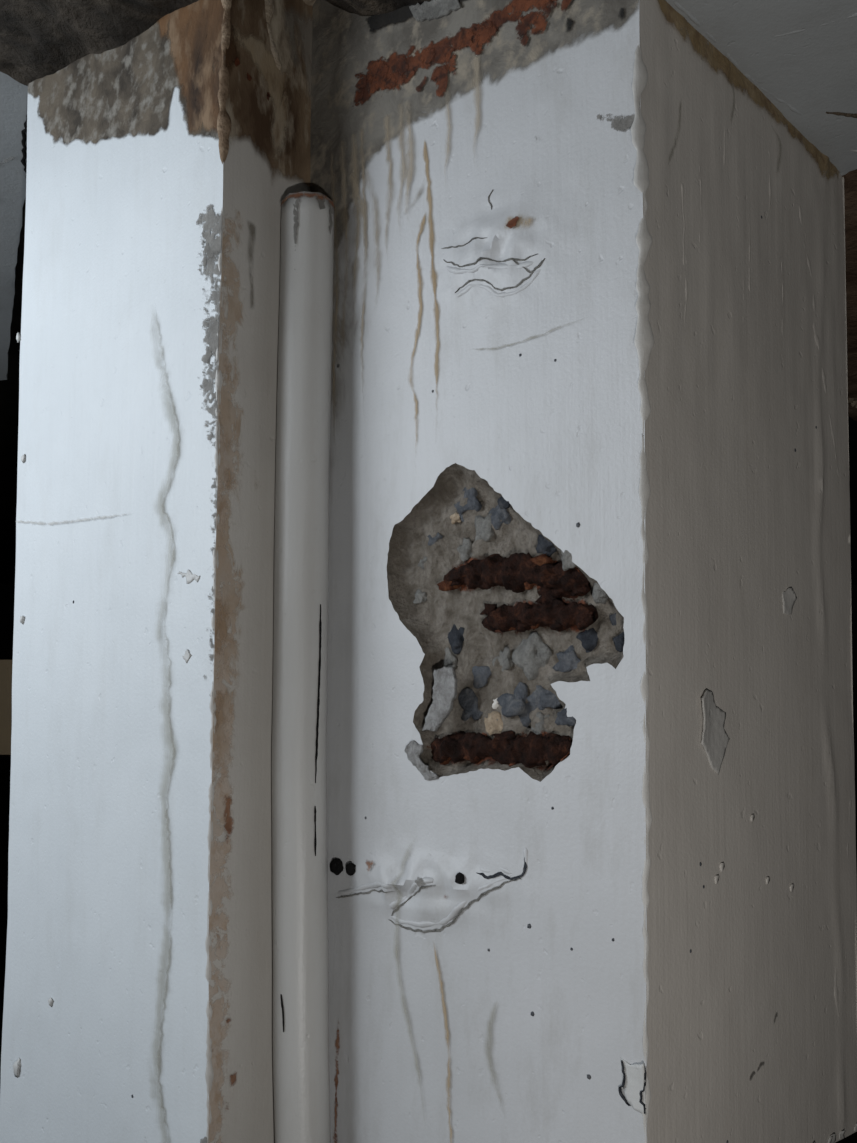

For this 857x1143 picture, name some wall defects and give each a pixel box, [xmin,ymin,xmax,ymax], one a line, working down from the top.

damp [28,0,639,397]
corrosion [354,0,572,106]
damp [658,0,839,179]
crack [826,111,857,119]
peeling [196,204,253,1143]
spalling [387,463,625,782]
peeling [701,690,730,775]
damp [435,952,449,1047]